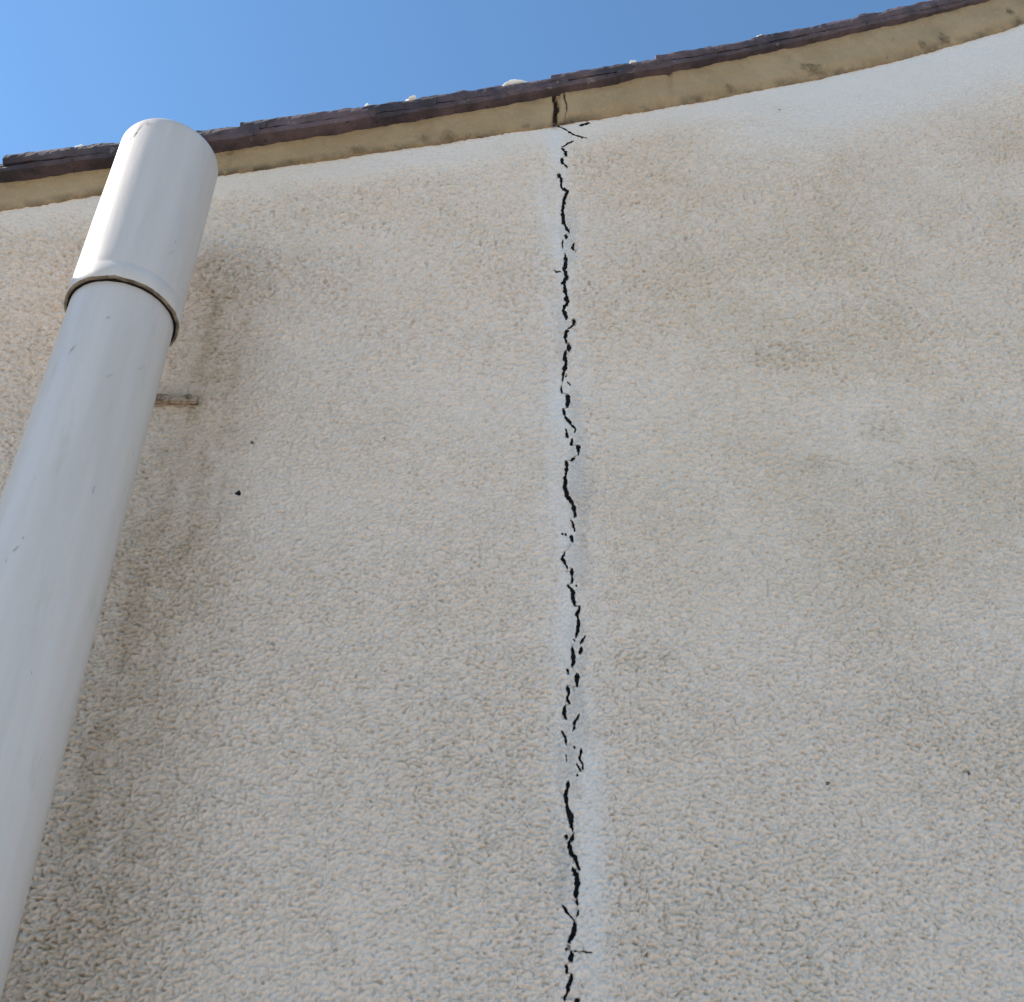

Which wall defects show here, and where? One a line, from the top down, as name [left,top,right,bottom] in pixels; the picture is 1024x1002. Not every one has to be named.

crack [553,92,592,1002]